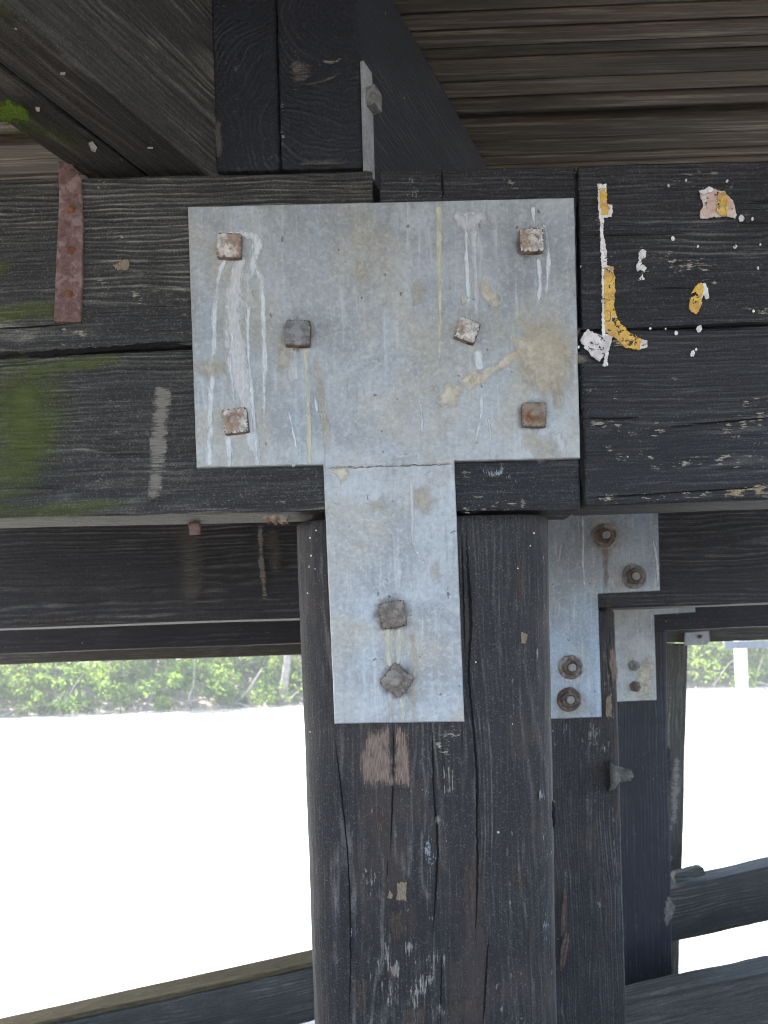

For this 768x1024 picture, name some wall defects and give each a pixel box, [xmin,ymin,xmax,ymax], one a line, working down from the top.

leakage [206,230,268,466]
leakage [454,212,484,312]
peeling [578,184,651,367]
peeling [699,179,754,222]
peeling [718,397,767,437]
spalling [682,483,768,498]
crack [333,727,352,1012]
crack [386,729,394,875]